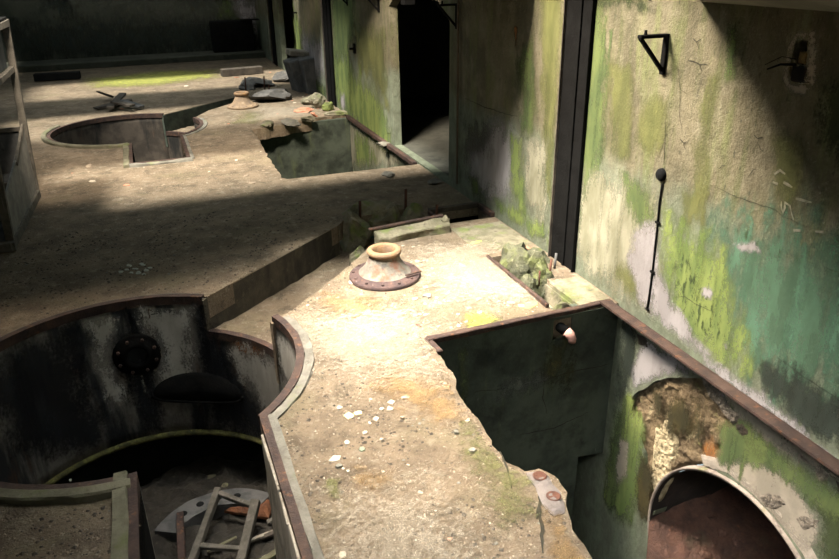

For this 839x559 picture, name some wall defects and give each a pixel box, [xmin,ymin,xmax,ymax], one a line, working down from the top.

water stain [522,121,549,225]
water stain [576,163,663,311]
water stain [0,324,111,460]
water stain [192,304,265,437]
spalling [436,284,619,523]
flaking render [615,439,628,484]
water stain [617,320,680,524]
flaking render [631,333,691,387]
corrosion [653,388,692,436]
corrosion [704,439,717,459]
water stain [703,275,839,442]